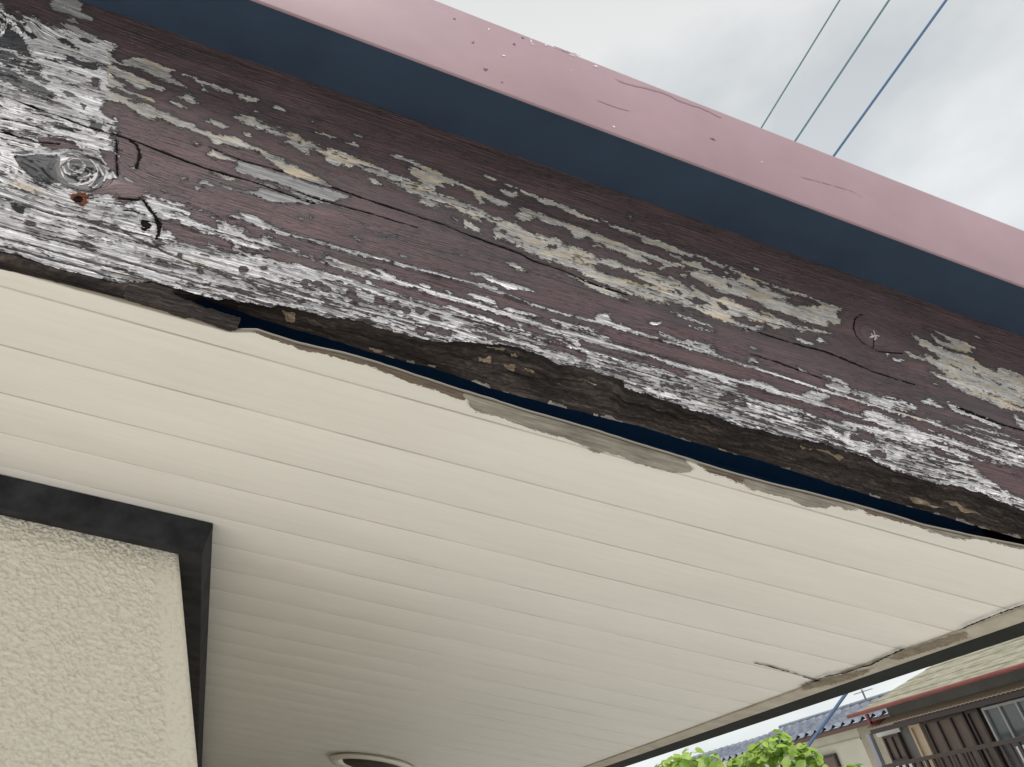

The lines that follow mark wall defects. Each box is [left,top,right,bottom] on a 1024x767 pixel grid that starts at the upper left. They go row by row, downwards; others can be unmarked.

rust [68,191,90,208]
crack [0,95,627,329]
peeling [0,0,1024,511]
crack [748,329,915,385]
peeling [252,331,1024,550]
crack [961,604,1024,630]
crack [754,648,905,682]